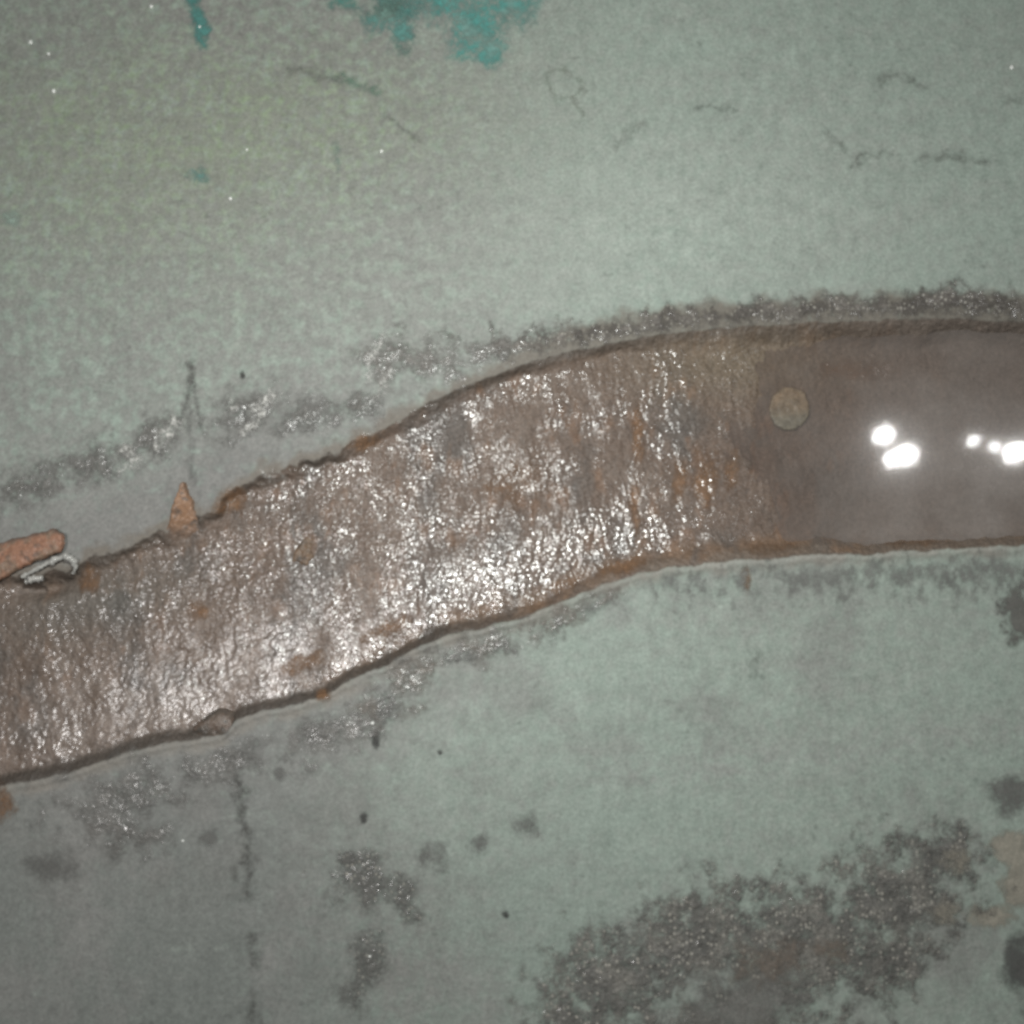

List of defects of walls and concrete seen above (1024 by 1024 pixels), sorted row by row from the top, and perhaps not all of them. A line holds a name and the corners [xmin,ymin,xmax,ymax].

corrosion [672,458,739,509]
corrosion [166,482,199,547]
corrosion [0,528,79,584]
corrosion [359,618,406,646]
corrosion [282,650,324,676]
damp [331,851,421,920]